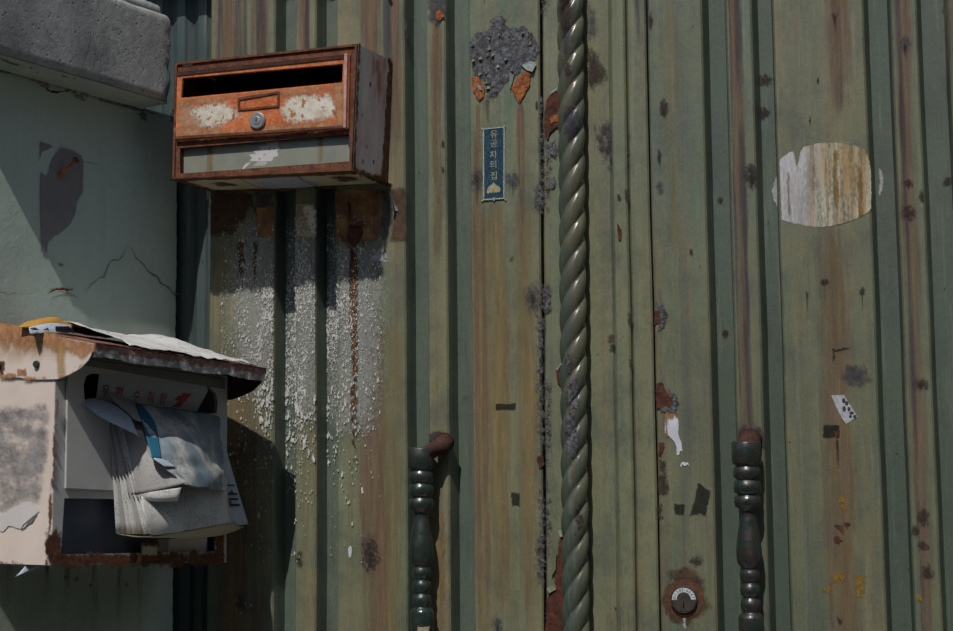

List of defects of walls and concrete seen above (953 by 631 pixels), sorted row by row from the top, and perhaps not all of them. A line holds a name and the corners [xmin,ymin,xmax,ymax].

corrosion [469,14,540,204]
corrosion [535,87,579,157]
crack [1,244,179,300]
corrosion [170,0,407,466]
peeling [655,382,690,519]
corrosion [545,529,564,631]